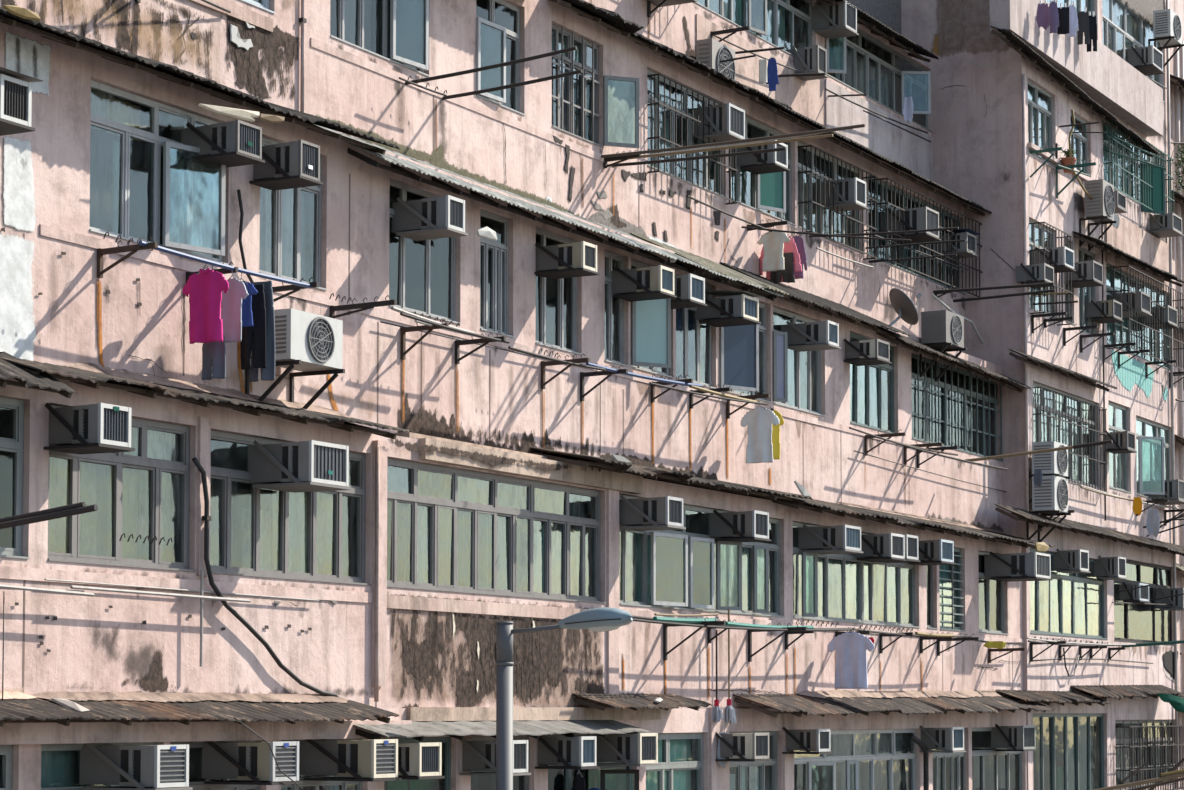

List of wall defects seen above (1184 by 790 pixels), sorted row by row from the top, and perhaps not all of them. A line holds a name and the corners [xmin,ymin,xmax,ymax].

damp [2,0,301,108]
peeling [230,21,255,51]
peeling [0,137,42,361]
damp [389,393,718,480]
damp [95,627,176,692]
damp [392,594,604,707]